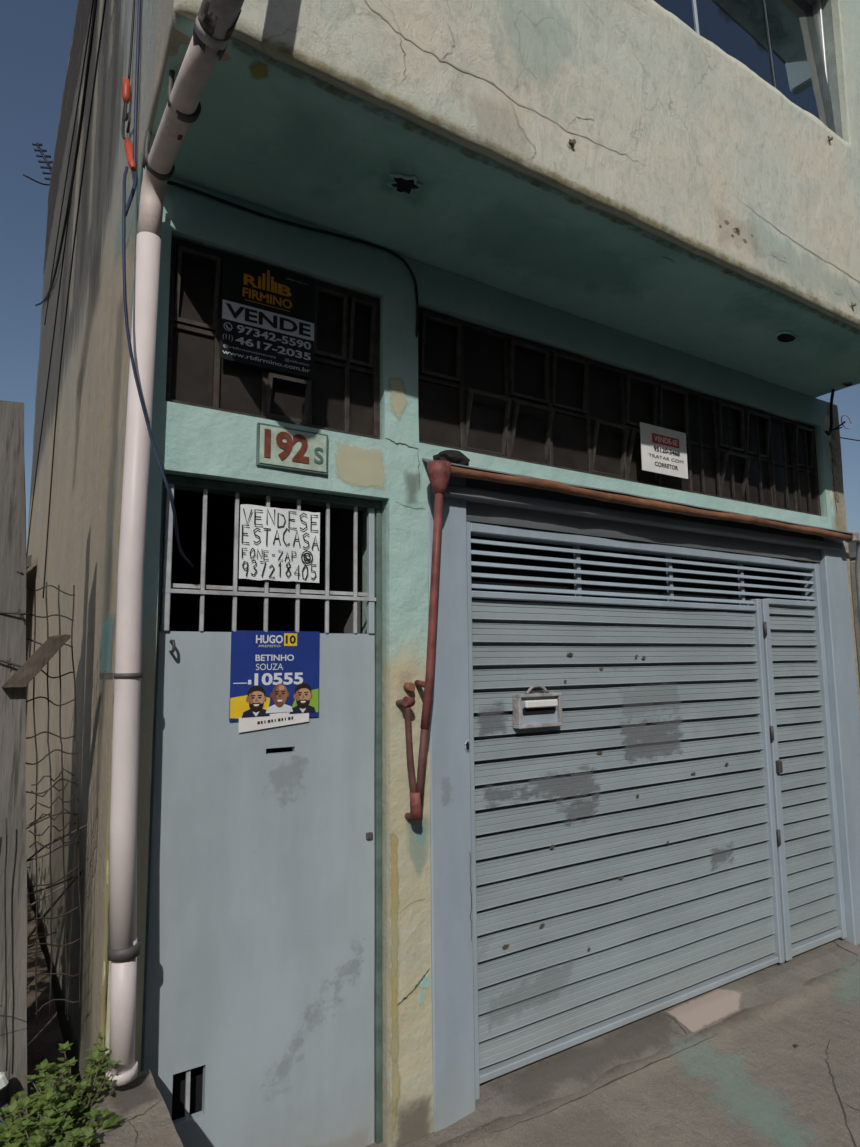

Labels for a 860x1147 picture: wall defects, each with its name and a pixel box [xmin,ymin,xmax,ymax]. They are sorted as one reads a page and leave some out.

crack [365,0,642,164]
hole [387,174,424,196]
damp [29,0,125,509]
peeling [335,444,385,487]
crack [825,1039,860,1147]